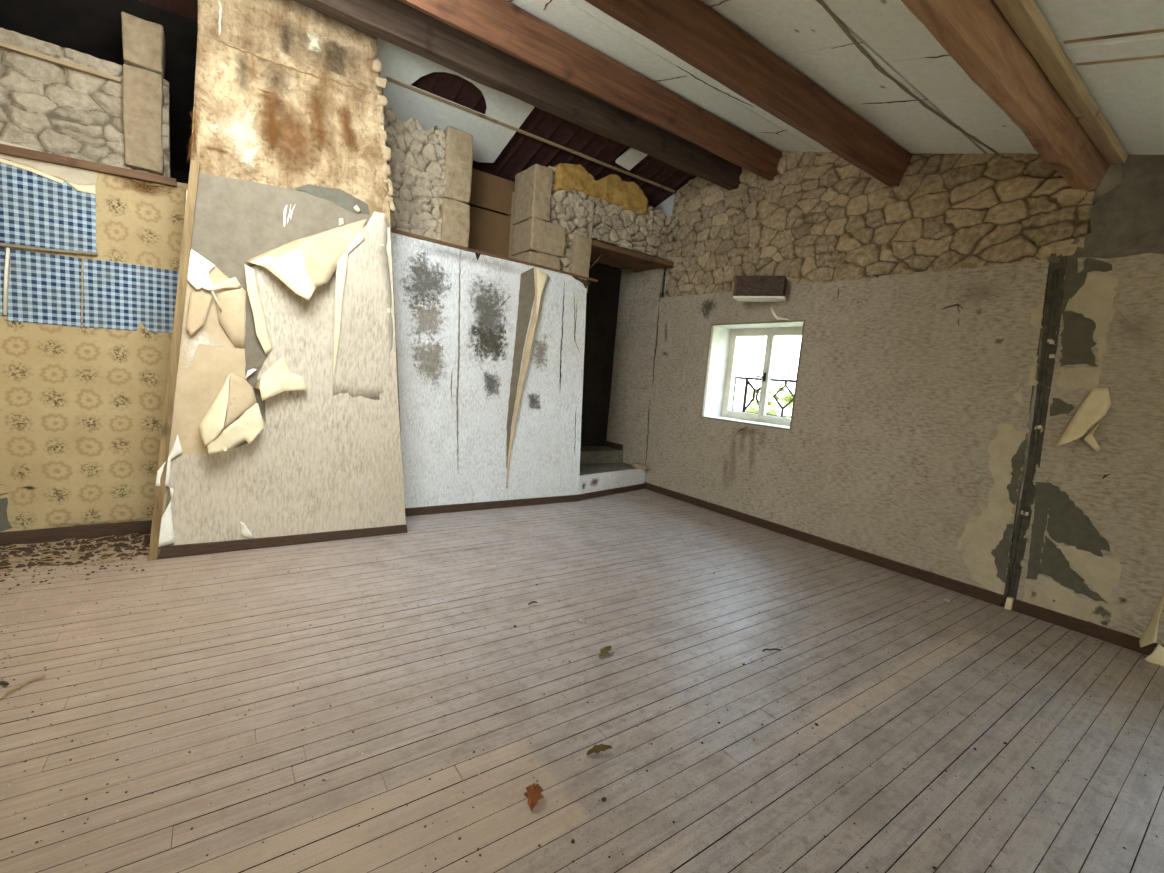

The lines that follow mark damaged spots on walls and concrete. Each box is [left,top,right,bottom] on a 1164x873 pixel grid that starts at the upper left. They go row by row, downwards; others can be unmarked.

damp [342,111,354,146]
crack [864,97,928,105]
peeling [186,277,268,379]
peeling [250,247,315,300]
damp [402,253,452,383]
damp [468,279,508,361]
damp [484,373,500,398]
peeling [506,267,535,468]
damp [528,393,540,409]
peeling [1050,258,1119,417]
peeling [954,355,1039,595]
flaking render [1023,481,1122,627]